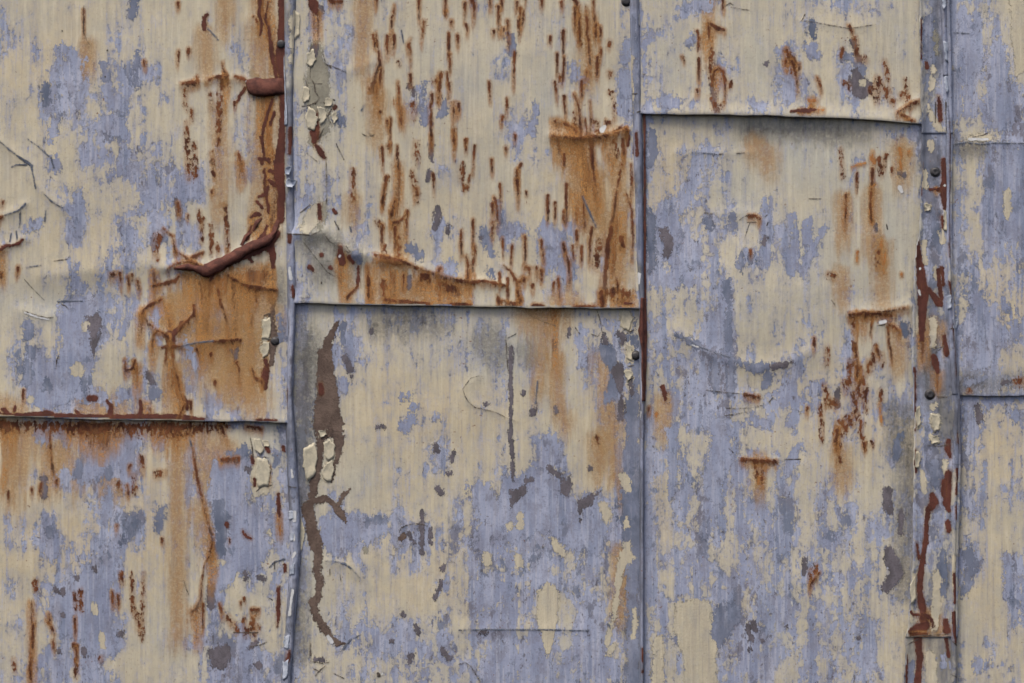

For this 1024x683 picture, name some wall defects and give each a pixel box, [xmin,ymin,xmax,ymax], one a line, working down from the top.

rust [0,358,232,641]
rust [109,0,295,433]
peeling [203,438,274,683]
peeling [302,40,346,148]
peeling [288,318,407,647]
peeling [432,563,446,602]
peeling [428,442,456,497]
rust [496,132,642,425]
peeling [464,308,765,683]
rust [681,0,733,112]
rust [805,340,885,487]
rust [837,13,959,683]